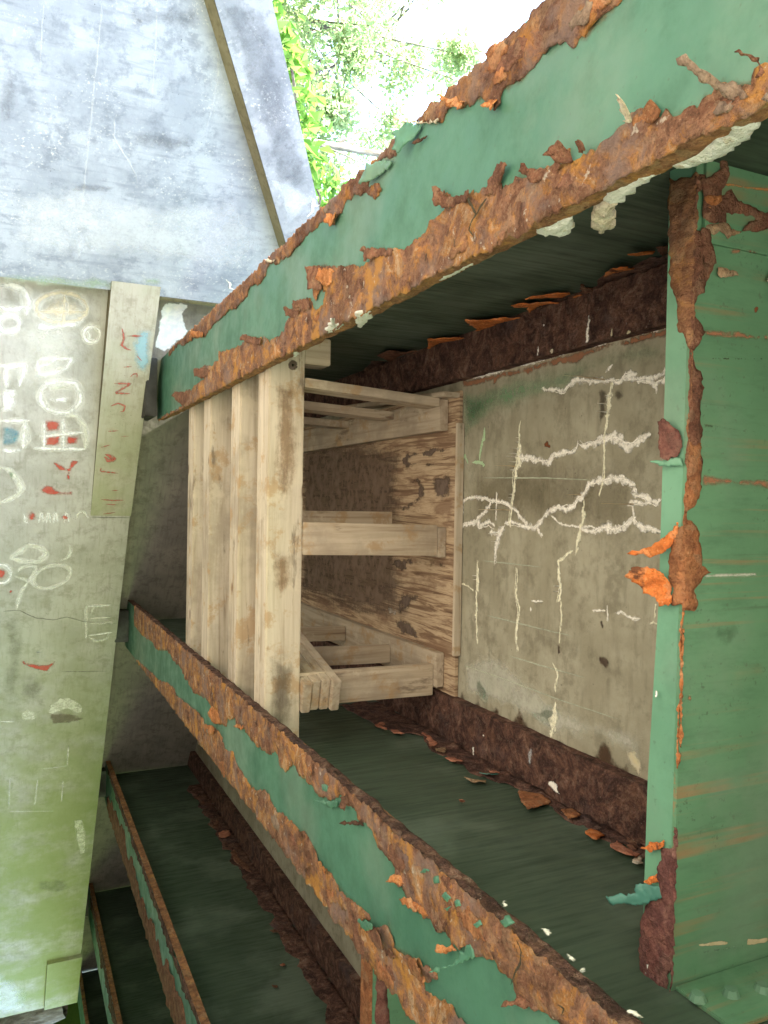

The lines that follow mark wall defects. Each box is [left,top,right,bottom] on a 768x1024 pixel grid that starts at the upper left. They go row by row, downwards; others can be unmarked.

rust [158,0,768,772]
rust [107,768,200,1024]
rust [128,600,678,1024]